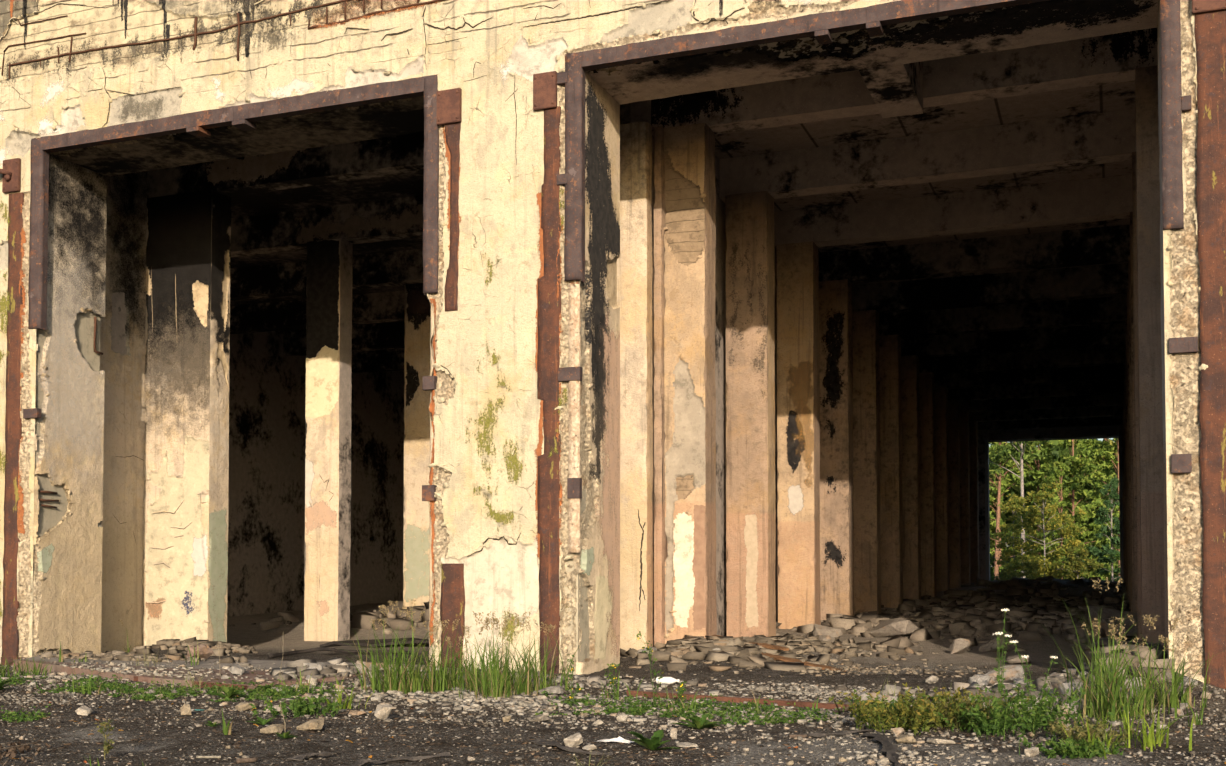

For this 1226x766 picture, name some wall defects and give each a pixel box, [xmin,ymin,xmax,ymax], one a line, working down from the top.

crack [0,0,116,41]
crack [88,68,181,128]
water stain [4,0,419,134]
flaking render [0,0,443,83]
water stain [0,274,11,333]
spalling [0,191,73,657]
corrosion [429,298,437,485]
flaking render [404,125,539,670]
water stain [465,345,514,532]
corrosion [535,381,563,559]
corrosion [535,192,564,372]
flaking render [500,0,860,673]